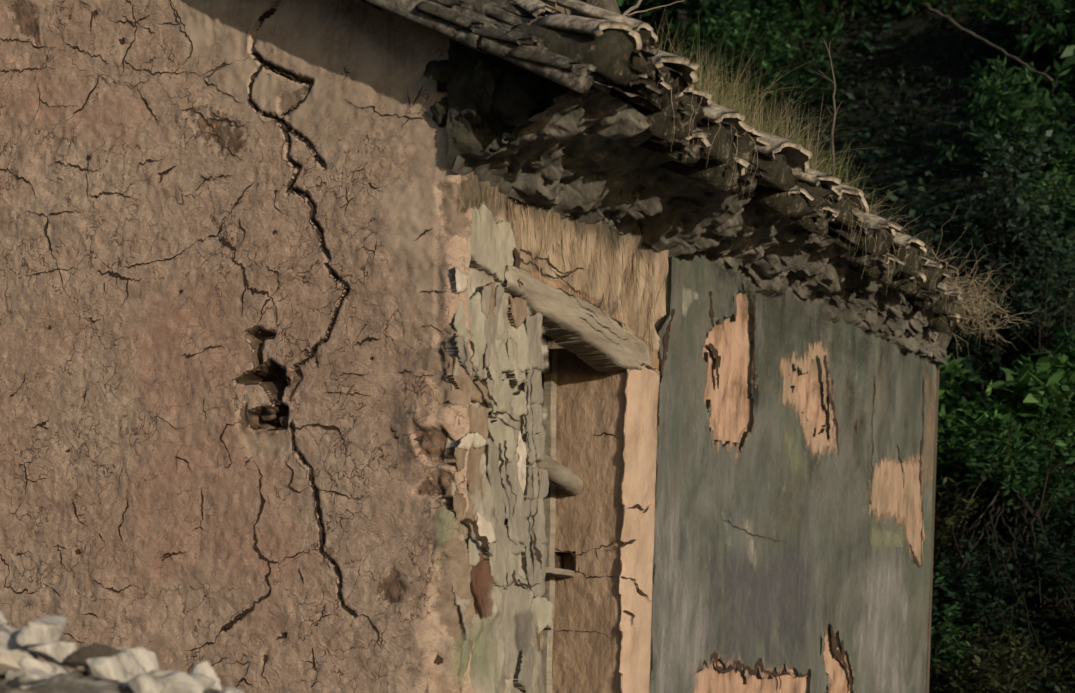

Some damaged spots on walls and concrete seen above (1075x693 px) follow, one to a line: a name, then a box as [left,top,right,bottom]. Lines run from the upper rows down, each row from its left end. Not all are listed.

crack [343,67,431,131]
crack [0,0,369,396]
crack [343,164,379,214]
crack [355,337,380,346]
peeling [413,183,553,693]
peeling [702,293,758,458]
peeling [778,335,837,461]
crack [0,544,140,598]
crack [71,398,380,688]
peeling [869,454,926,566]
peeling [689,656,807,693]
peeling [823,626,854,693]